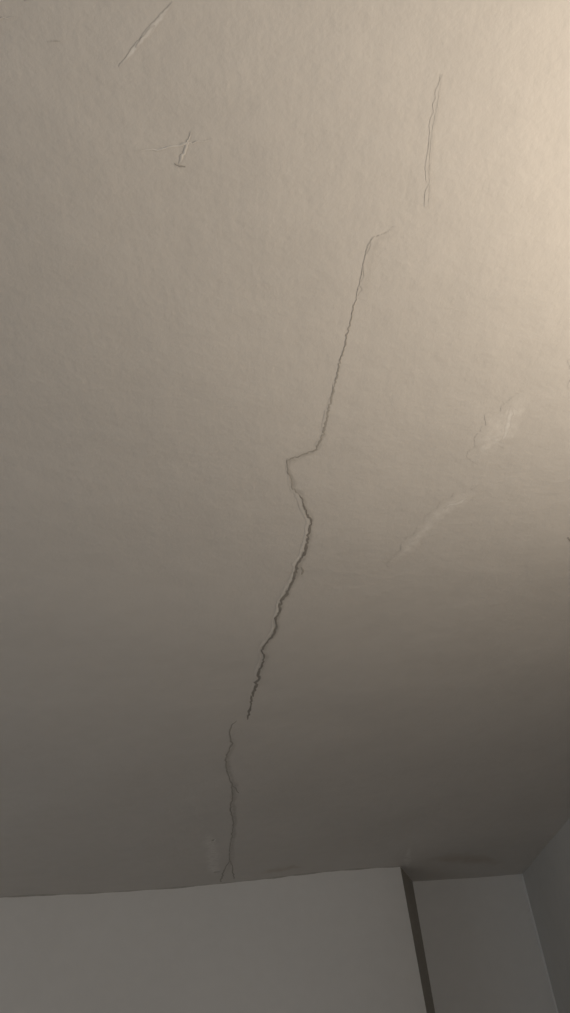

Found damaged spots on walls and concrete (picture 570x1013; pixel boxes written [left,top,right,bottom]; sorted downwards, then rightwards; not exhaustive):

crack [0,227,402,898]